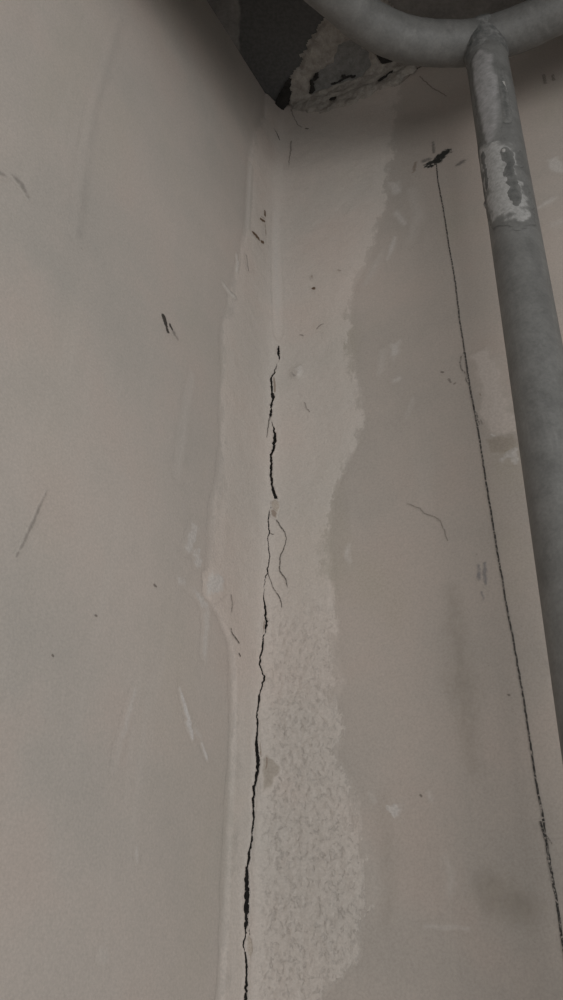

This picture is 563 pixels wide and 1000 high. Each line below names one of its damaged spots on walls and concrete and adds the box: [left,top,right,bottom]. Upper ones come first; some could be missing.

flaking render [275,18,417,114]
crack [231,346,288,1000]
crack [407,503,448,541]
crack [436,163,563,953]